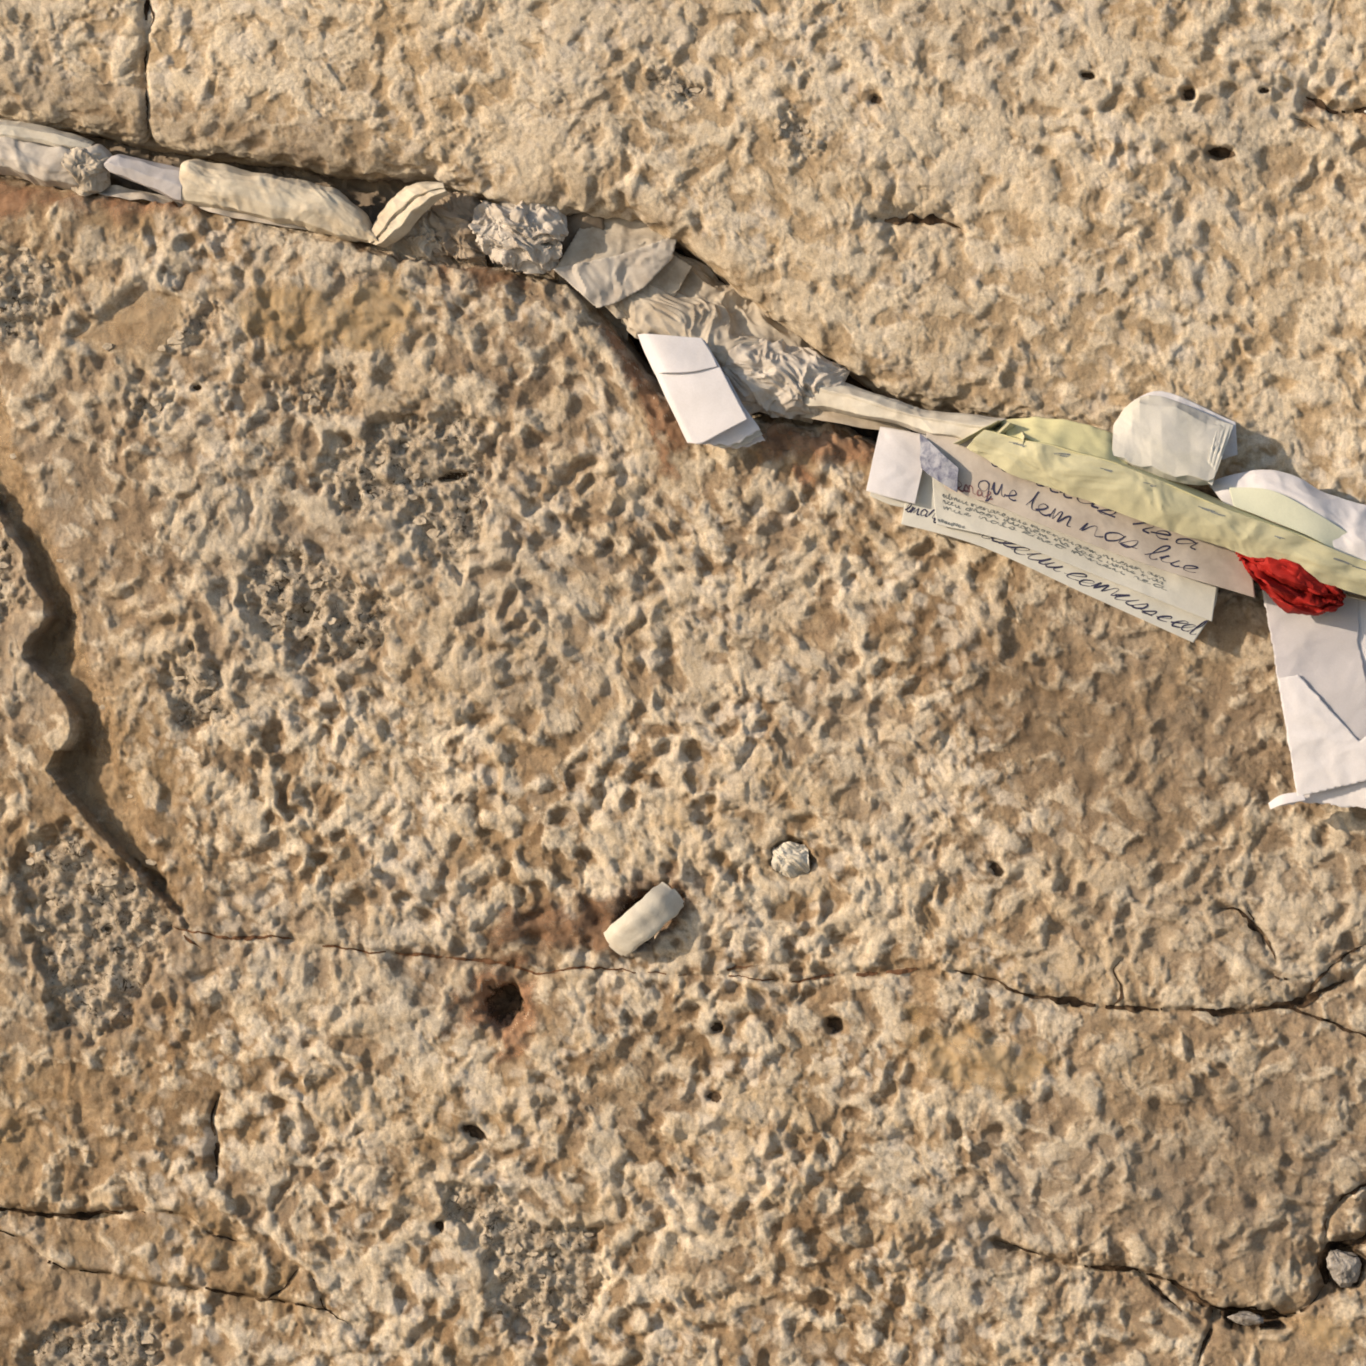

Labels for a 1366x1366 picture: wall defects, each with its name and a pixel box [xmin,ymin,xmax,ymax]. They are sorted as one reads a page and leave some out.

crack [144,0,154,135]
crack [1295,97,1366,128]
crack [169,926,917,983]
crack [955,907,1366,1037]
crack [210,1096,220,1177]
crack [0,1207,173,1237]
crack [206,1231,236,1241]
crack [47,1260,108,1273]
crack [186,1269,347,1323]
crack [995,1184,1366,1363]